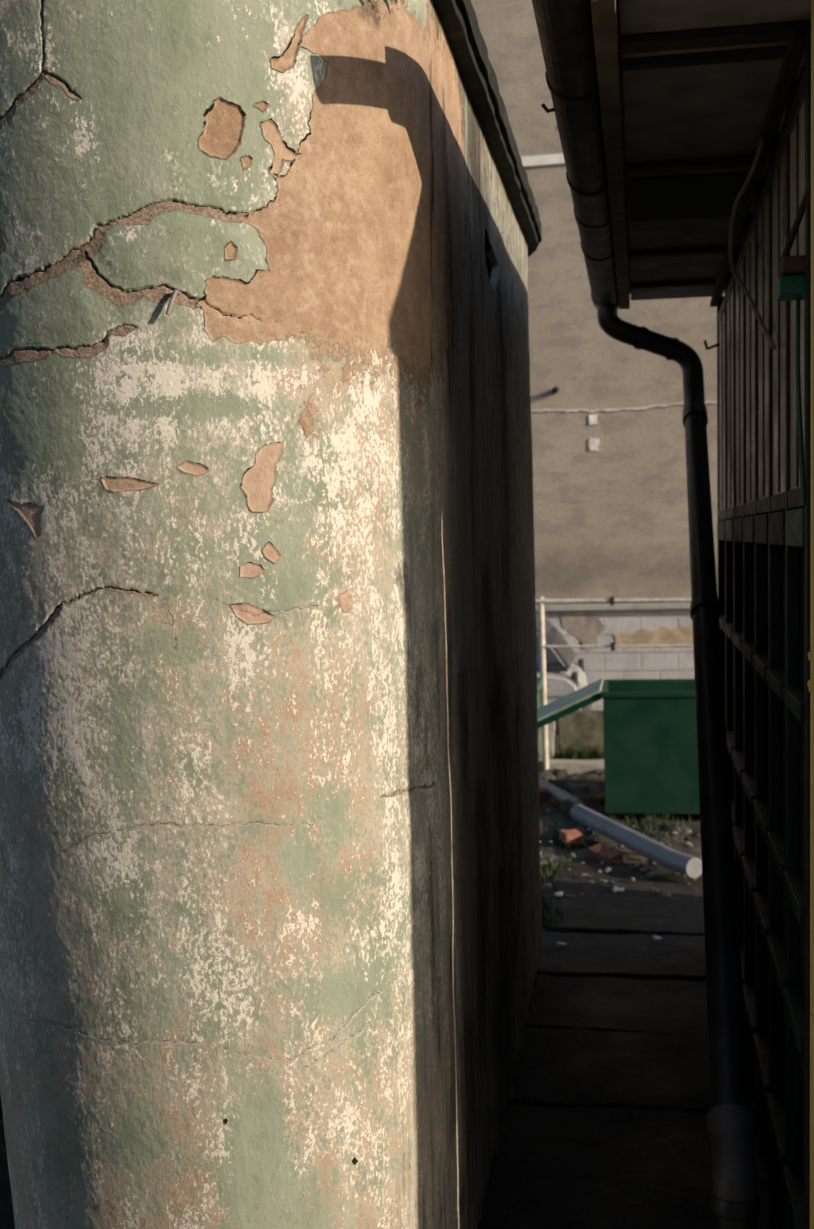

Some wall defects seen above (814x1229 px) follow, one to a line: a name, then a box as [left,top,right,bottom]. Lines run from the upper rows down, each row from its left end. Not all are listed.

water stain [461,84,487,256]
crack [0,200,268,367]
peeling [100,476,160,492]
peeling [176,461,209,476]
peeling [241,442,285,522]
peeling [5,499,43,540]
peeling [240,541,282,578]
peeling [230,602,275,625]
peeling [338,590,354,613]
crack [0,587,177,680]
crack [380,782,436,798]